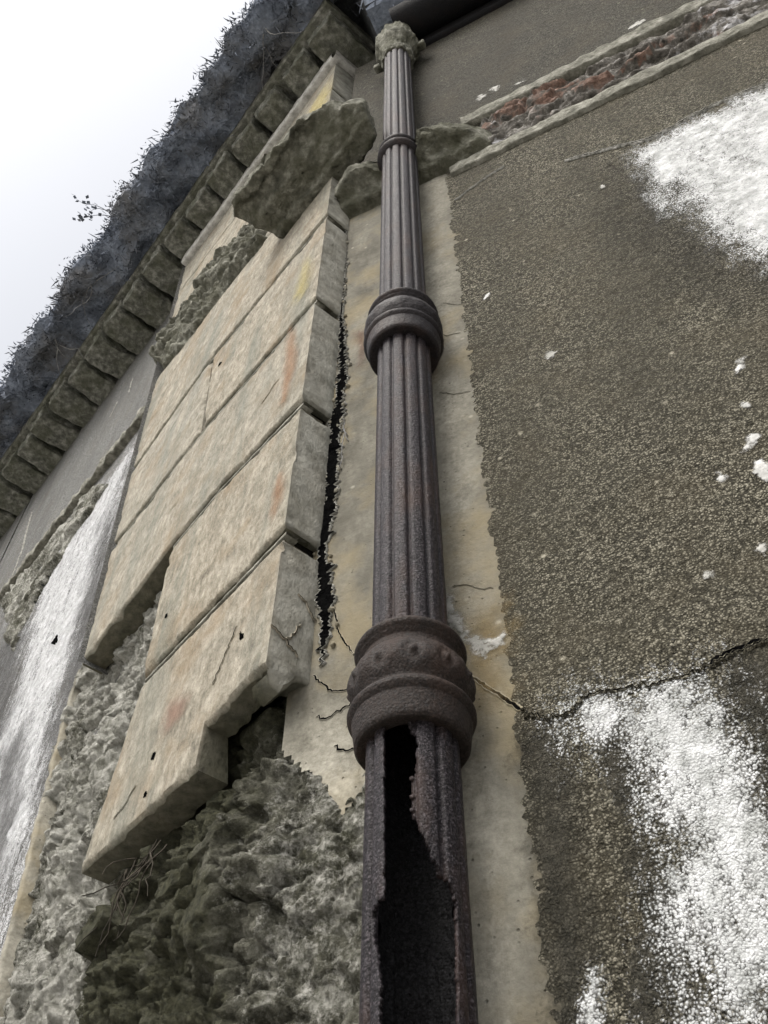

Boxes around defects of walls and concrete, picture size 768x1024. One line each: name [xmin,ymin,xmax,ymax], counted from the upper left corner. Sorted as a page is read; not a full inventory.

spalling [480,0,768,145]
damp [627,87,768,272]
crack [270,224,354,720]
flaking render [0,484,109,651]
damp [0,436,135,951]
spalling [0,591,365,1024]
crack [334,744,354,752]
flaking render [446,594,506,659]
crack [472,637,768,724]
damp [517,656,768,1024]